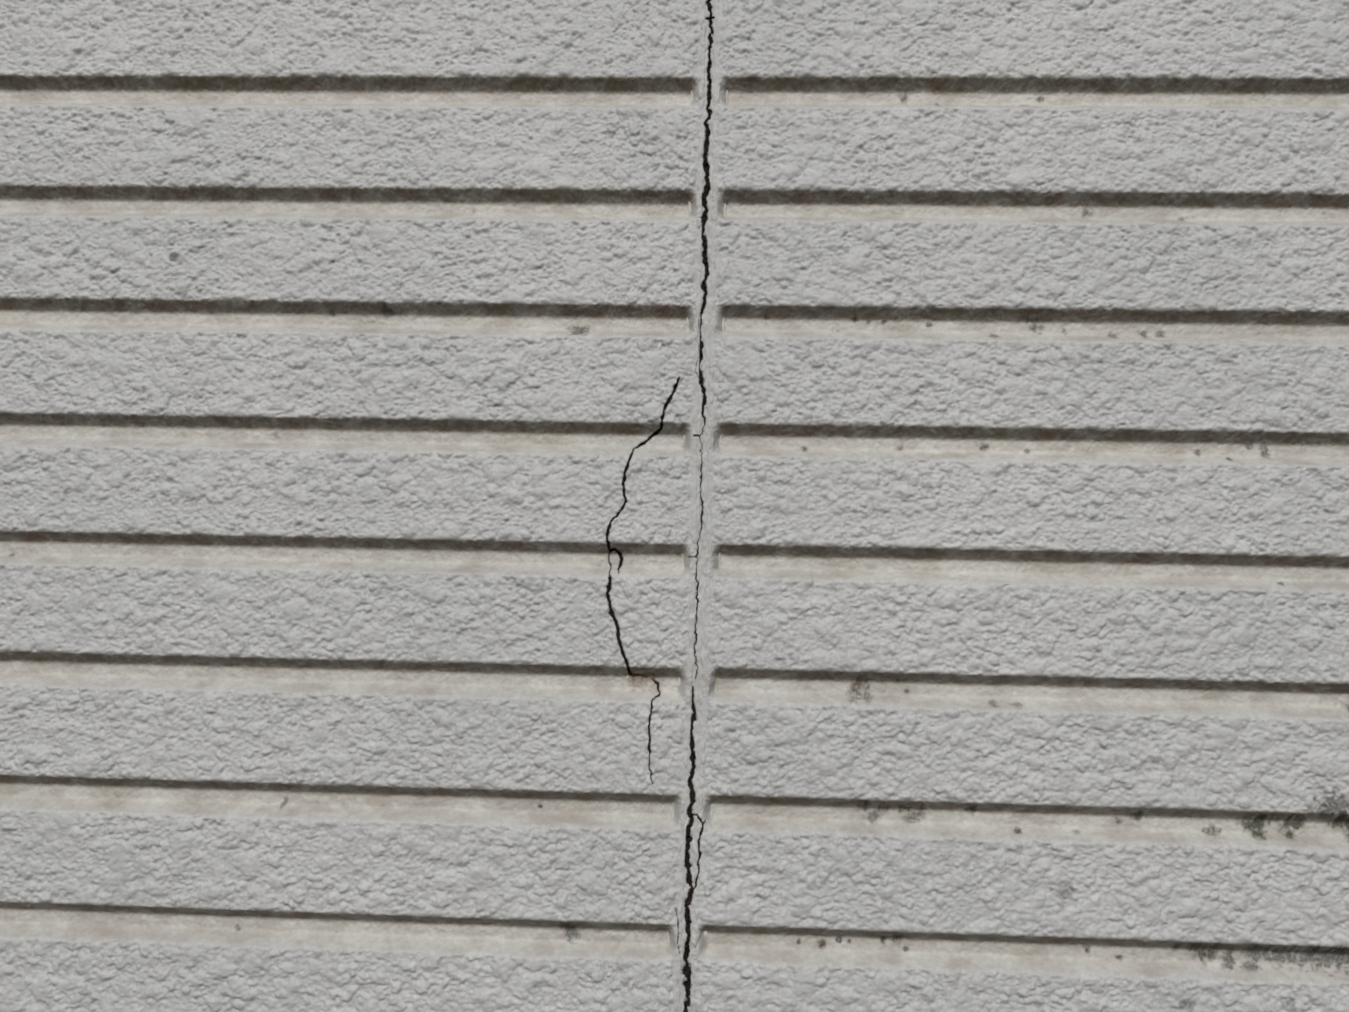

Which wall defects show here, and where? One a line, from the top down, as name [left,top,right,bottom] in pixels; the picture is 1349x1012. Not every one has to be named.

crack [606,0,715,1012]